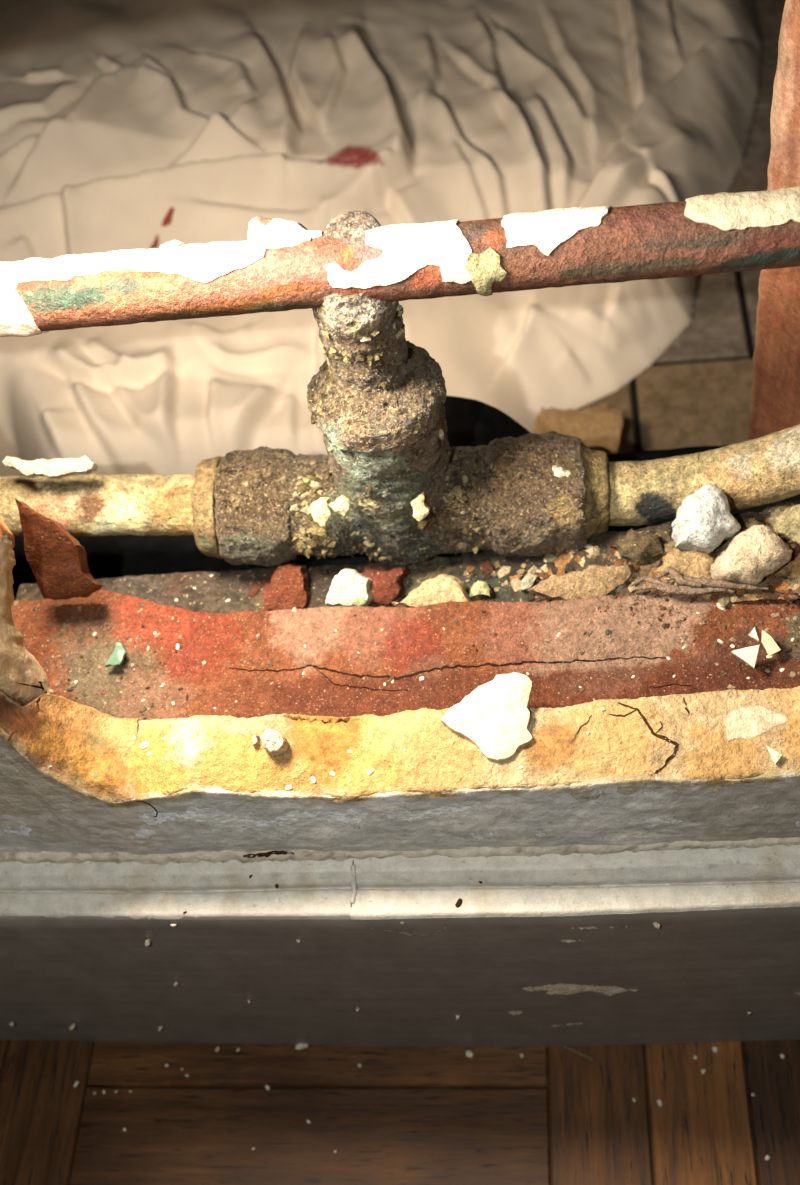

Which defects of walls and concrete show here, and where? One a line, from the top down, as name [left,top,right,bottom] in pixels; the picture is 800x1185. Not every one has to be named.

peeling [501,206,612,255]
peeling [684,186,800,231]
peeling [323,220,472,289]
peeling [0,236,311,337]
peeling [552,466,570,477]
peeling [311,495,352,527]
peeling [411,492,430,523]
peeling [105,642,127,667]
peeling [731,627,781,668]
crack [229,656,697,776]
spalling [0,686,800,840]